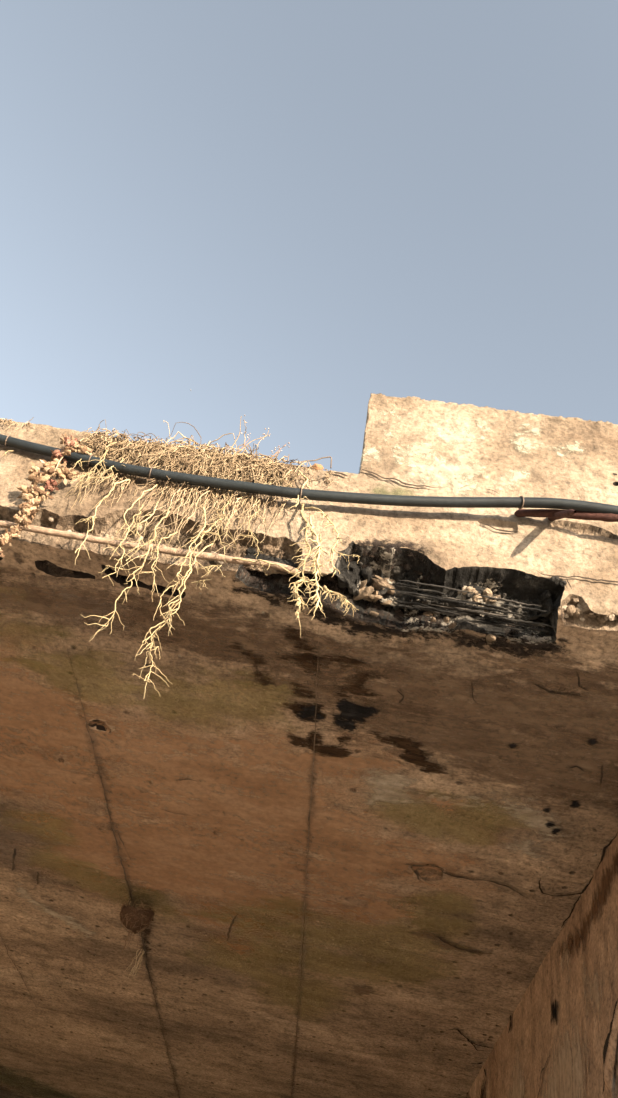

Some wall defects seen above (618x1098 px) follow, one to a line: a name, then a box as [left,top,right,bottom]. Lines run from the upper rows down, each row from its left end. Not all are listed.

crack [60,620,134,905]
spalling [0,505,618,645]
water stain [0,567,618,862]
crack [291,629,367,1098]
crack [139,932,180,1098]